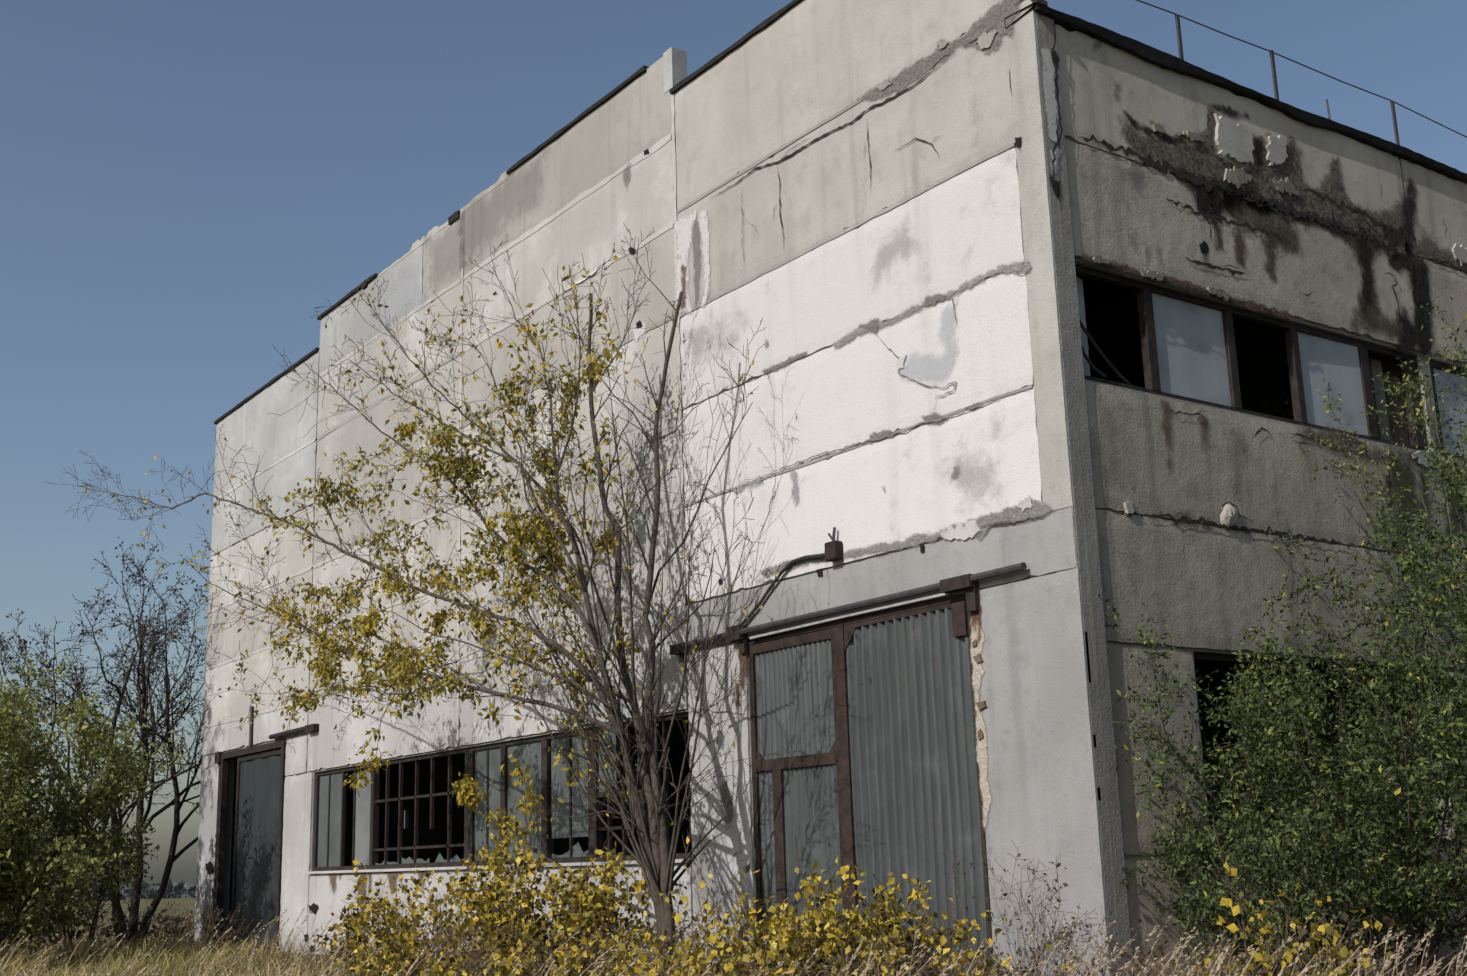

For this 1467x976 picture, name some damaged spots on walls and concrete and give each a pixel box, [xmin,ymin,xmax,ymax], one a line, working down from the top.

spalling [863,0,1019,101]
peeling [1041,23,1063,149]
crack [711,24,996,270]
peeling [672,210,710,313]
damp [1208,190,1298,281]
damp [1348,179,1434,356]
spalling [763,352,807,374]
peeling [859,294,956,425]
peeling [869,430,894,444]
peeling [761,557,825,577]
peeling [843,497,1051,559]
spalling [970,618,992,827]